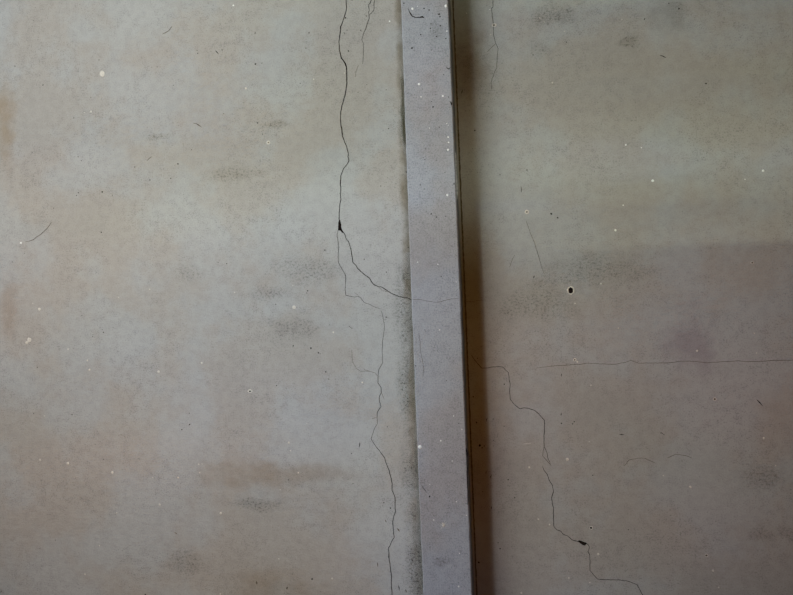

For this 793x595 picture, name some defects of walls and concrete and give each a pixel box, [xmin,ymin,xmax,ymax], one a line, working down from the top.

crack [337,0,450,590]
crack [471,355,643,595]